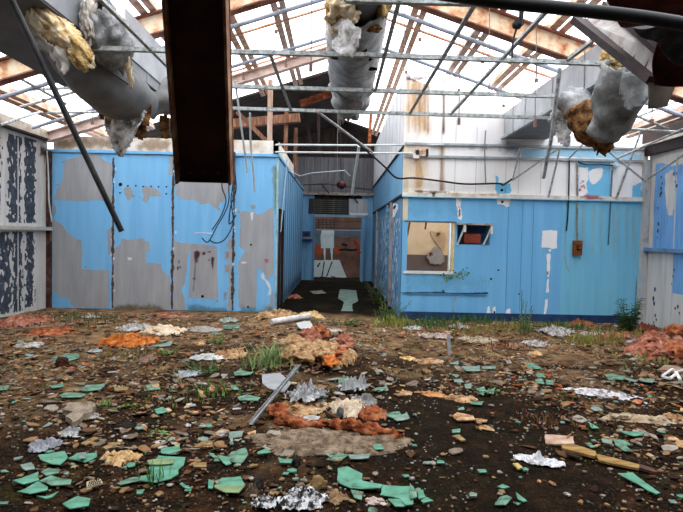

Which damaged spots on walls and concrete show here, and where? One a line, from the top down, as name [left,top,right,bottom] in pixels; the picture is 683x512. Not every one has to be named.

peeling [0,133,37,314]
peeling [52,154,274,310]
peeling [541,230,557,314]
peeling [521,145,642,197]
peeling [657,148,683,216]